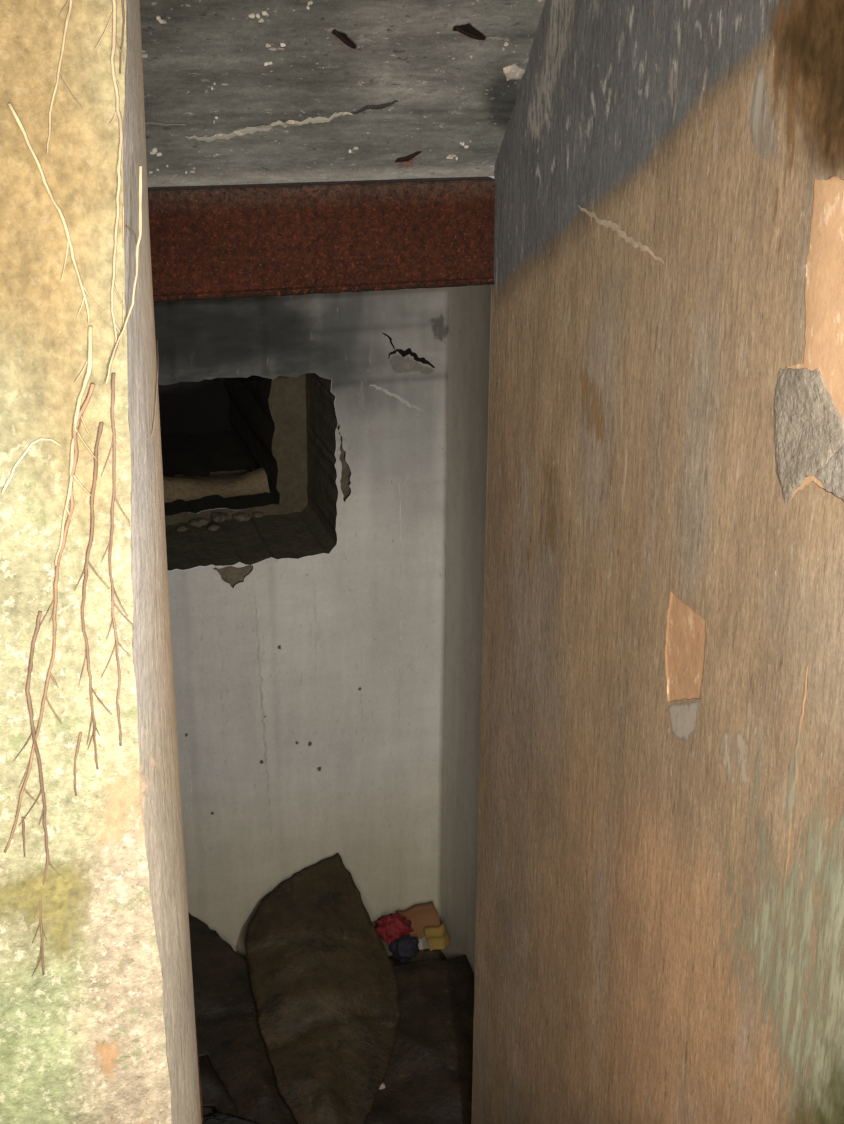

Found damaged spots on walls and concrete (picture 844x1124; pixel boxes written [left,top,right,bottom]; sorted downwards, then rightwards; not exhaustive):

crack [383,333,435,373]
flaking render [774,176,844,503]
flaking render [665,592,706,702]